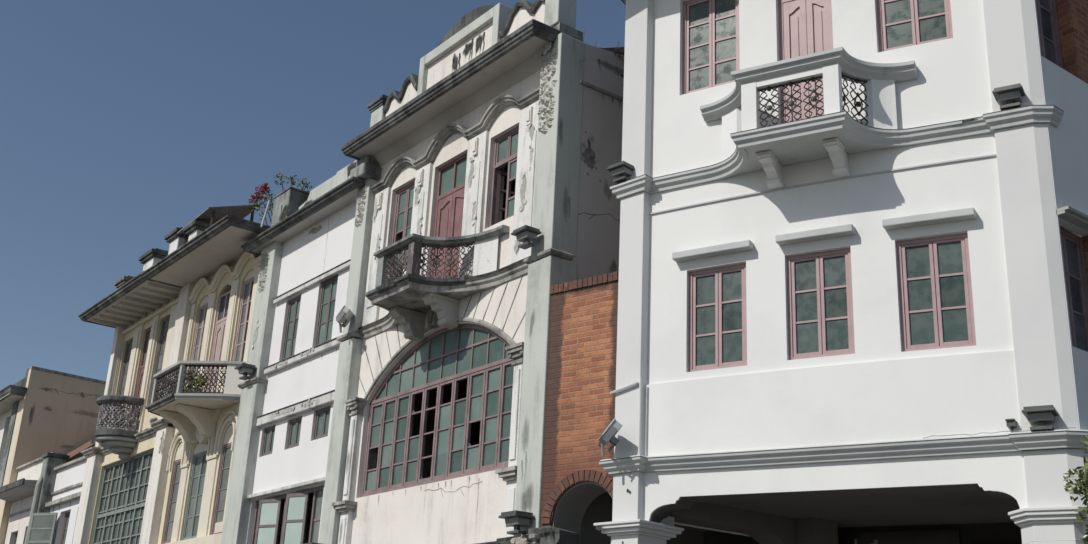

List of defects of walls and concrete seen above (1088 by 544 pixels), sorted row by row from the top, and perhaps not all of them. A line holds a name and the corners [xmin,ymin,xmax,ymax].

spalling [581,131,601,181]